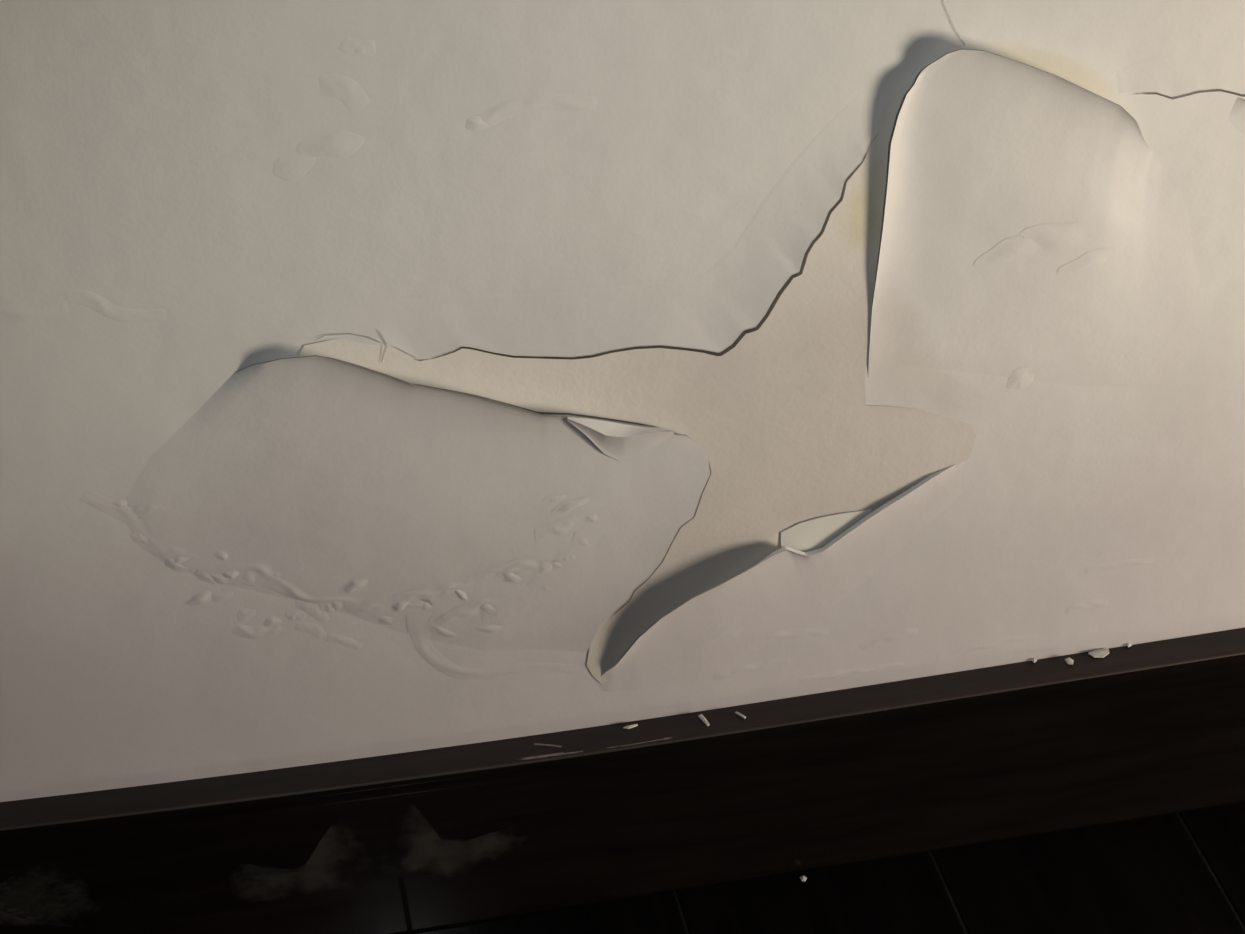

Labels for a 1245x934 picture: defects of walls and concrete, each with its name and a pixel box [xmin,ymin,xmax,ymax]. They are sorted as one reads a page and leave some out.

peeling [125,79,976,692]